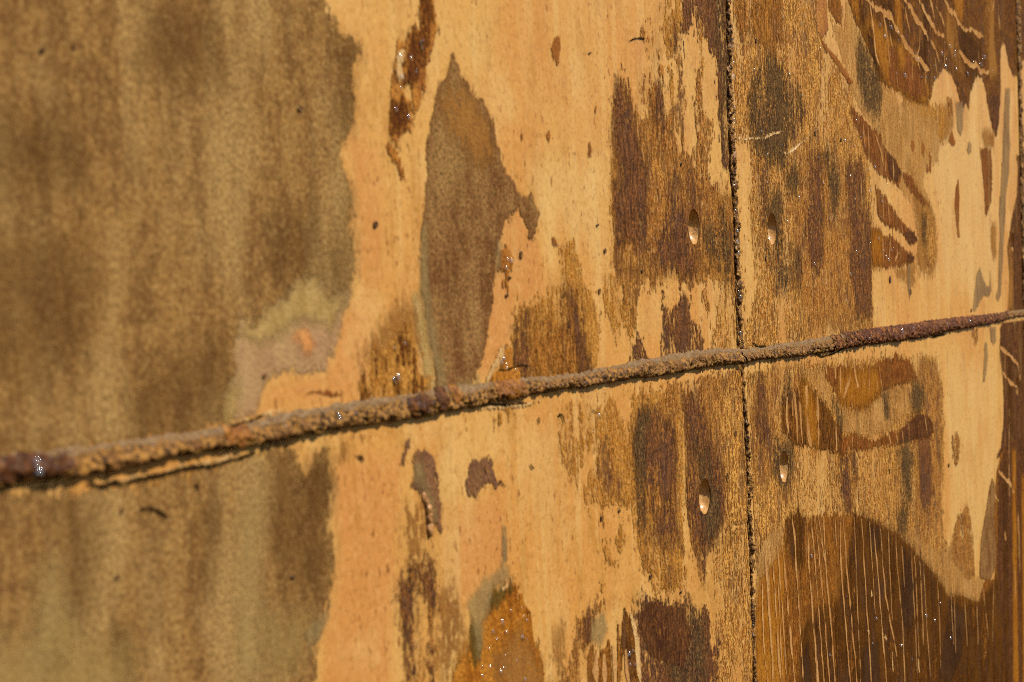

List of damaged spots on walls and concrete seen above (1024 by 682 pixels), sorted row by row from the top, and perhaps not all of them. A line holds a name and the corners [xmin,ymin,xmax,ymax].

corrosion [0,451,77,484]
leakage [0,441,346,682]
leakage [0,0,362,456]
corrosion [222,423,254,449]
corrosion [358,300,463,415]
leakage [412,52,540,390]
corrosion [490,0,1009,682]